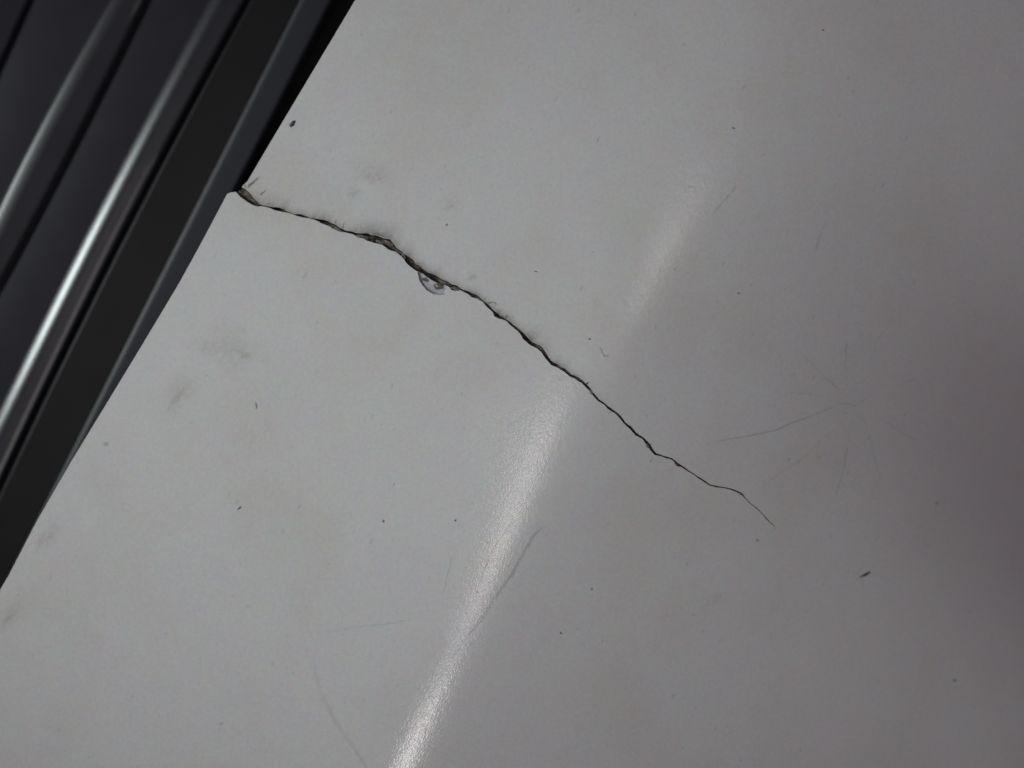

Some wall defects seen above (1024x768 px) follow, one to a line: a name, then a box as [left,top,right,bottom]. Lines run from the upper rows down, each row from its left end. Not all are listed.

crack [236,182,774,526]